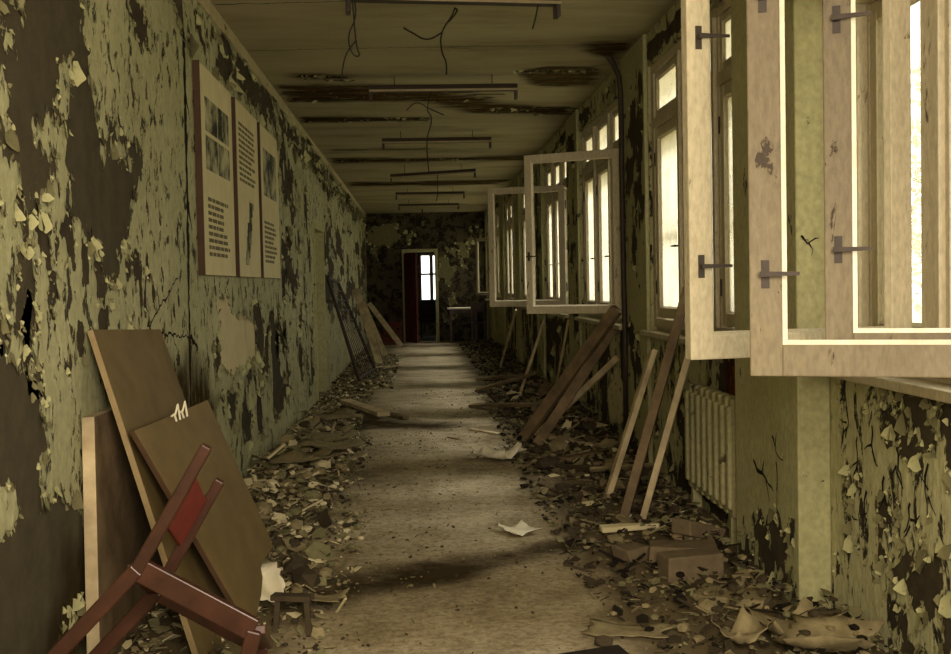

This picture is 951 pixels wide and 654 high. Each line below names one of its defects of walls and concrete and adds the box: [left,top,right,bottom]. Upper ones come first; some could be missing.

spalling [171,0,681,462]
peeling [0,0,158,654]
peeling [832,456,863,577]
peeling [861,388,951,494]
peeling [872,482,951,654]